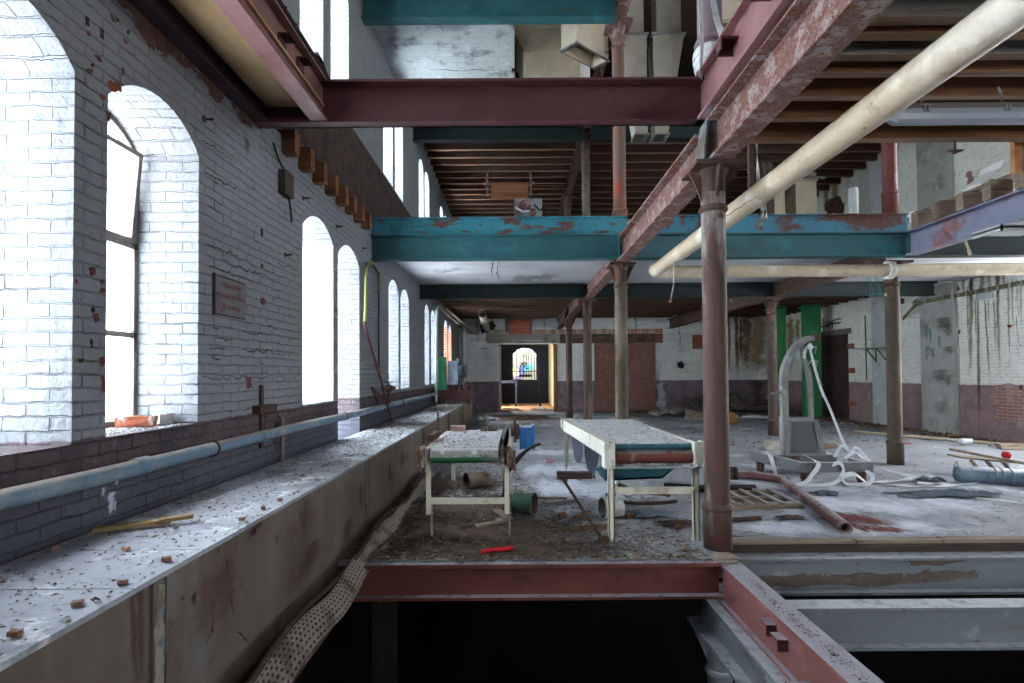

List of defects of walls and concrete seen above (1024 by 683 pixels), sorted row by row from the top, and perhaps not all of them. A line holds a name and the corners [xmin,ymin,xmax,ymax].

spalling [110,0,252,128]
crack [201,130,266,193]
crack [205,244,297,284]
rust [727,317,741,365]
damp [967,283,1013,401]
peeling [656,382,667,409]
spalling [992,383,1024,428]
peeling [759,560,981,590]